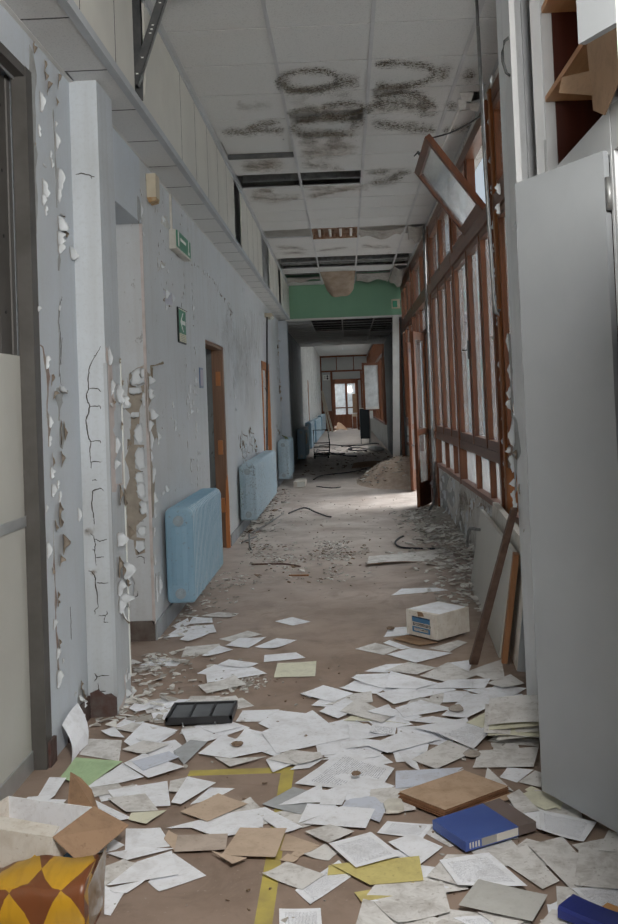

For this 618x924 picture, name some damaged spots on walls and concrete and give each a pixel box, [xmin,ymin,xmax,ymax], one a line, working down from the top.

peeling [29,42,80,271]
water stain [222,60,470,153]
peeling [40,301,71,688]
crack [85,346,108,623]
peeling [106,346,177,624]